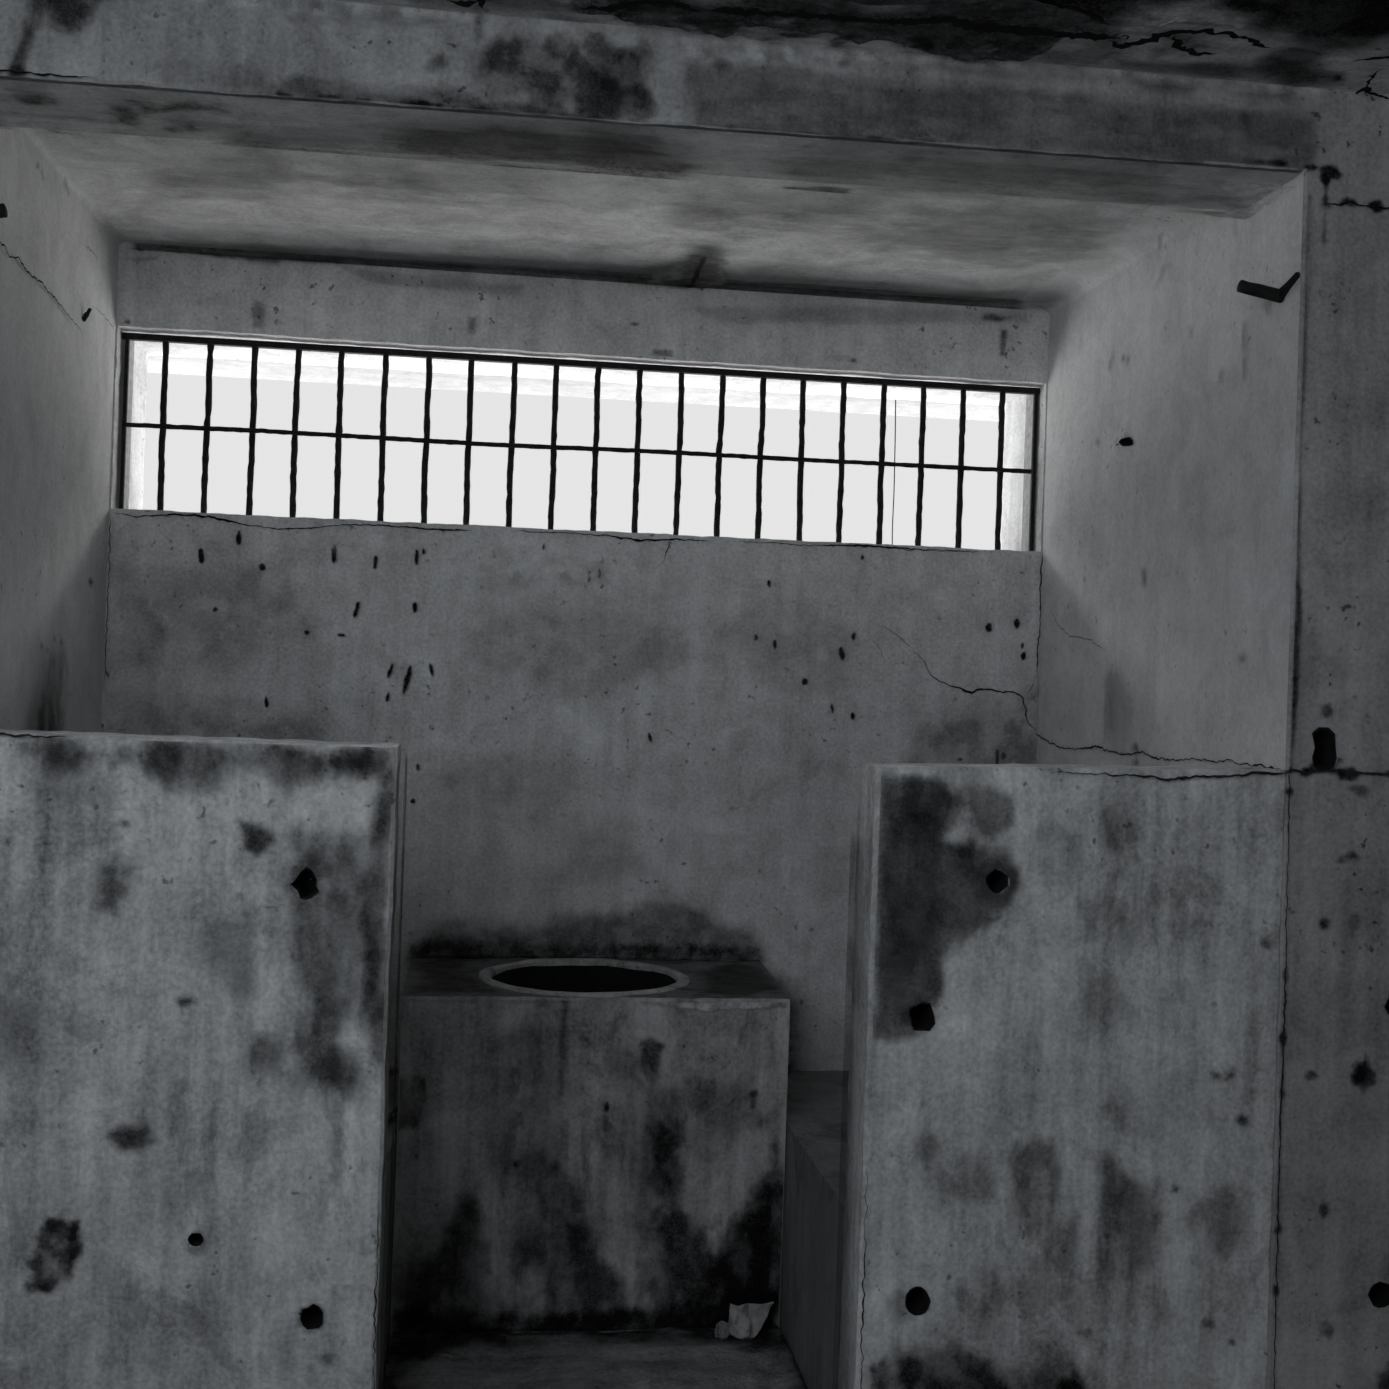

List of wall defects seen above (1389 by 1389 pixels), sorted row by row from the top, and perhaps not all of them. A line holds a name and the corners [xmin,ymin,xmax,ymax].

crack [446,0,486,9]
water stain [488,36,650,119]
spalling [571,0,1120,64]
crack [1112,16,1269,56]
water stain [1035,0,1389,91]
crack [1352,56,1389,99]
crack [0,242,113,329]
water stain [874,777,1017,1037]
crack [873,625,1389,1389]
water stain [120,741,783,1389]